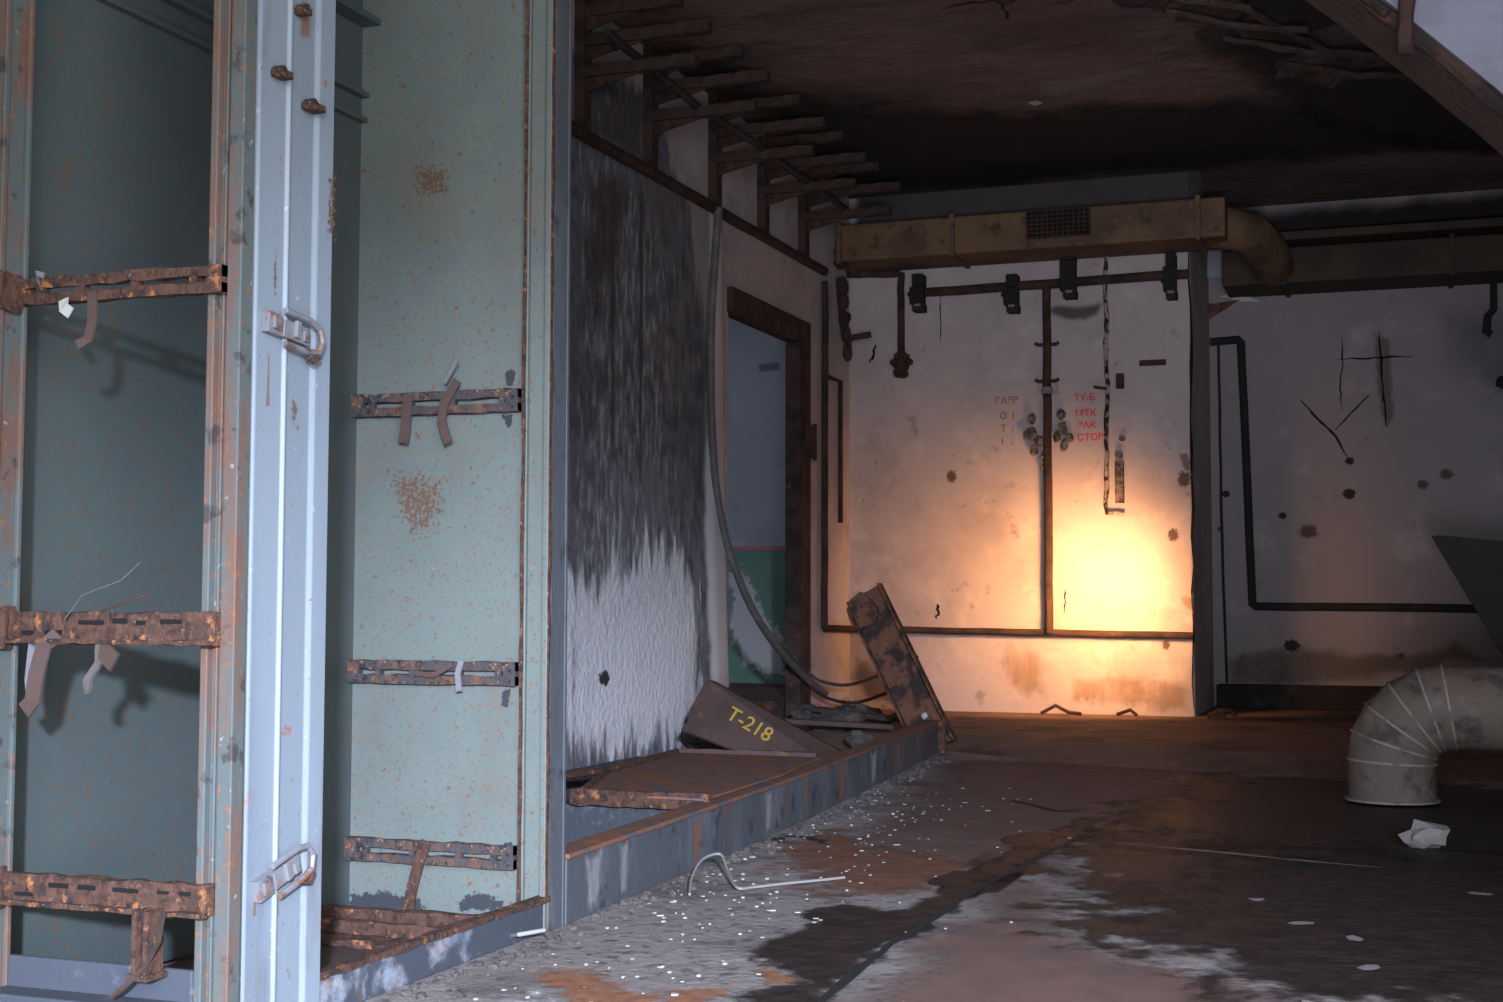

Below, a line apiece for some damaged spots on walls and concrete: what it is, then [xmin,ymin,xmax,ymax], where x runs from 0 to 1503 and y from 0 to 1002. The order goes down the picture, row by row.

damp [739,761,1503,1002]
rust [534,969,729,1002]
rust [753,969,800,983]